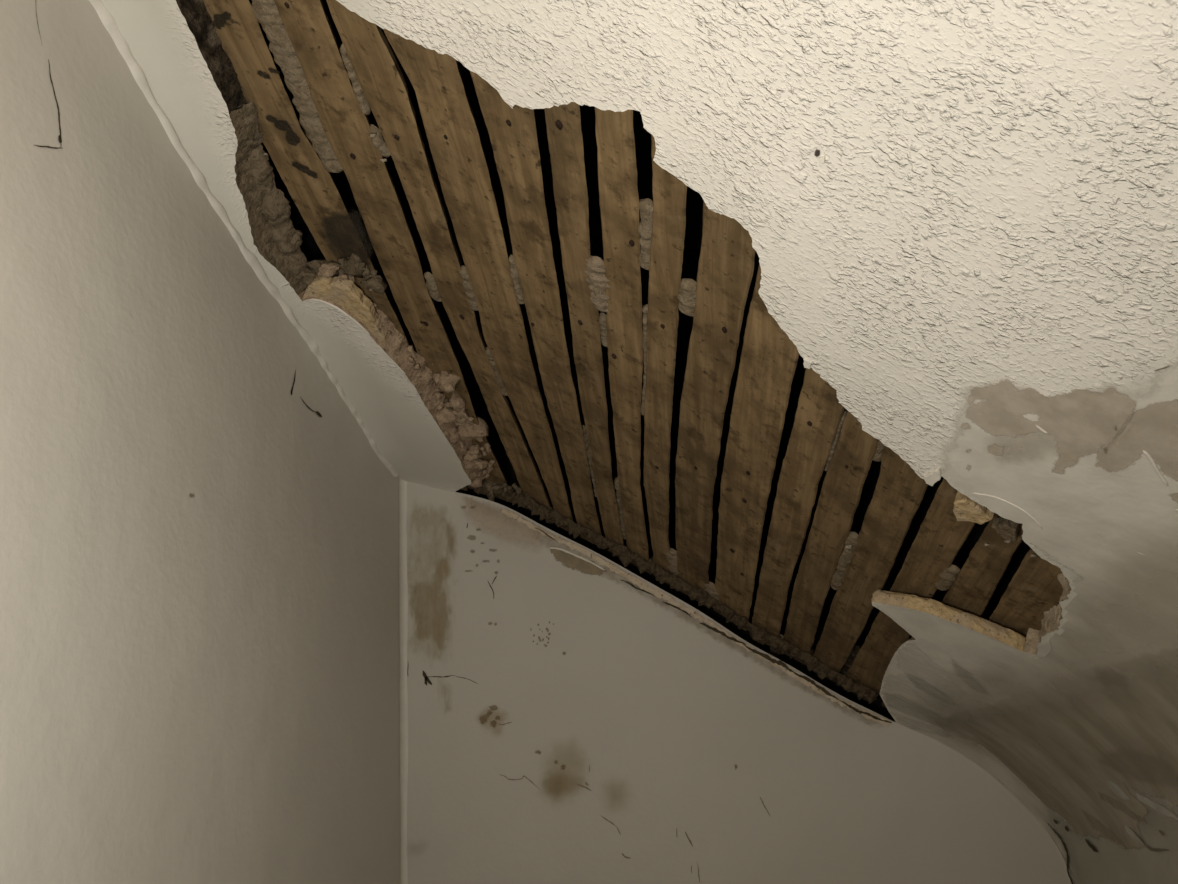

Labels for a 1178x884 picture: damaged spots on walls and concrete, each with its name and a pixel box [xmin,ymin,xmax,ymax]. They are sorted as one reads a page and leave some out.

spalling [176,0,891,726]
flaking render [872,363,1178,884]
leakage [941,573,1178,853]